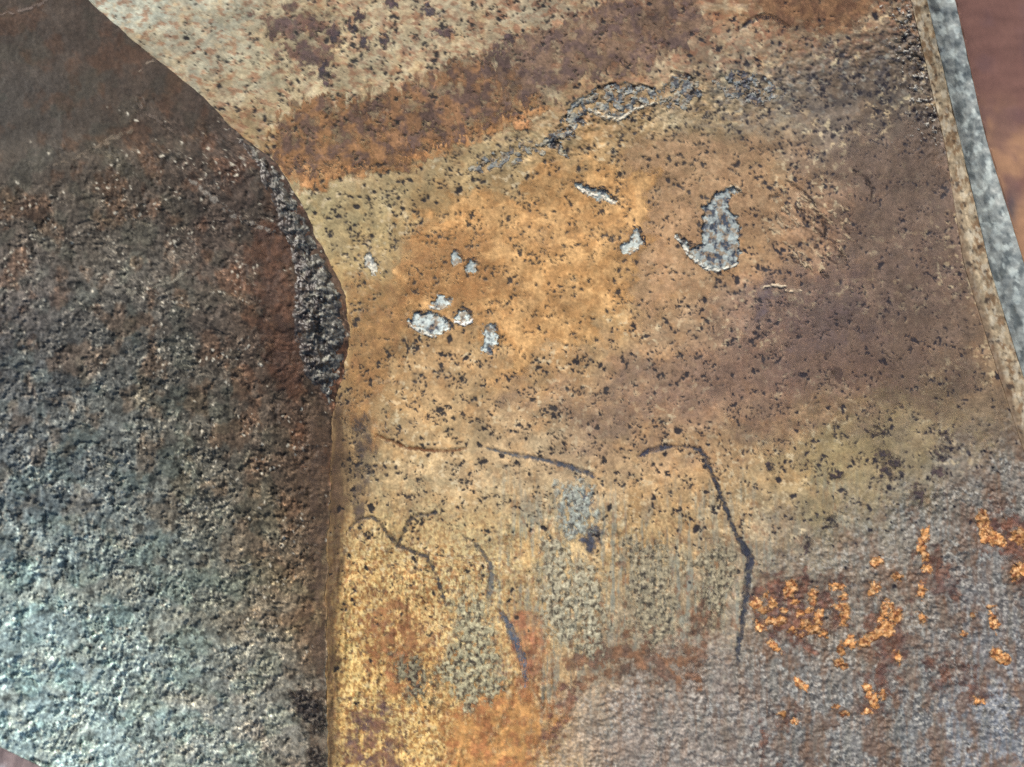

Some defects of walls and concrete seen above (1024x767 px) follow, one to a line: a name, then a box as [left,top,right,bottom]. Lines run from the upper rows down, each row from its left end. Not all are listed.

peeling [468,76,702,173]
peeling [619,226,646,255]
peeling [675,184,743,272]
peeling [407,294,501,355]
crack [487,448,594,478]
crack [349,510,447,606]
crack [640,445,755,664]
corrosion [970,497,1024,585]
crack [465,537,528,687]
corrosion [749,526,959,717]
corrosion [924,653,992,705]
corrosion [989,647,1012,666]